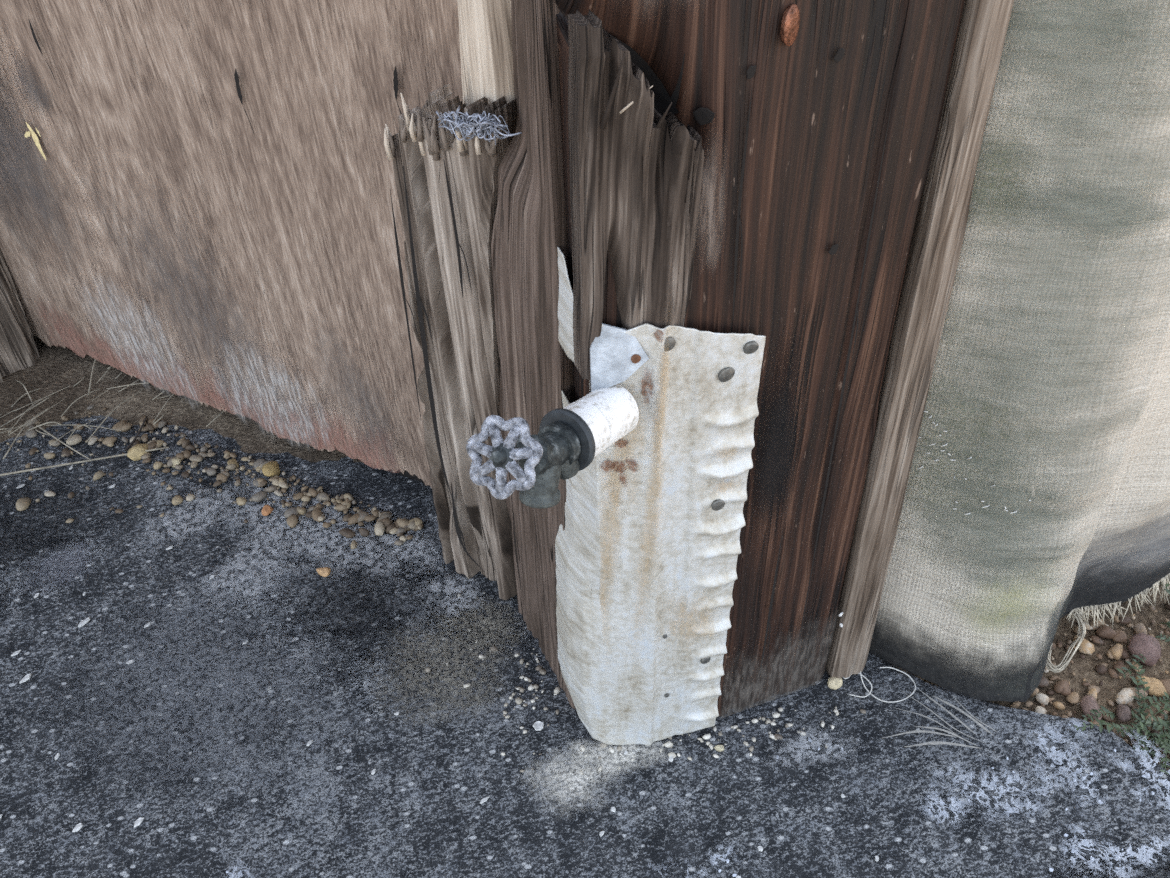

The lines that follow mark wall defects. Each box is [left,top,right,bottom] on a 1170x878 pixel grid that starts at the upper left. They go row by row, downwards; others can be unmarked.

rust [601,439,637,486]